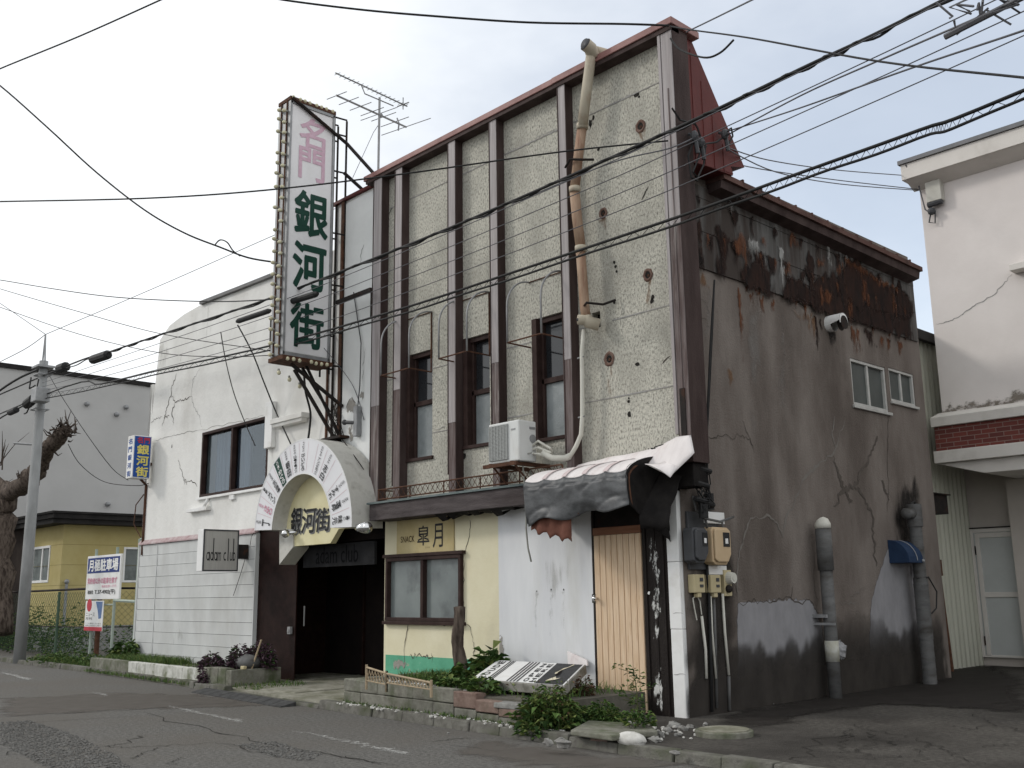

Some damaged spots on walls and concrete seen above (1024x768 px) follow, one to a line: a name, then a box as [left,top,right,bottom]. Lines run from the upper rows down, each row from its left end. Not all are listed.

corrosion [697,209,913,354]
crack [939,274,1012,324]
crack [151,360,262,441]
crack [834,420,890,566]
damp [896,479,918,542]
peeling [647,548,661,637]
peeling [654,675,663,709]
damp [688,590,1024,726]